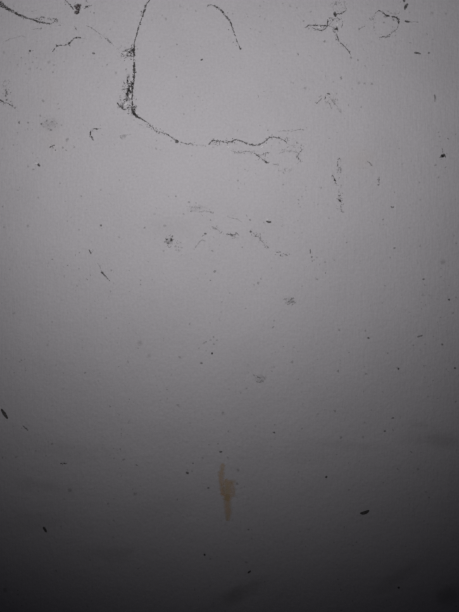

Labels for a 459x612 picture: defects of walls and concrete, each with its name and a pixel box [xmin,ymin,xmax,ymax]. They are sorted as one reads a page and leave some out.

crack [0,2,57,25]
crack [305,12,350,52]
crack [117,0,190,145]
crack [209,136,285,163]